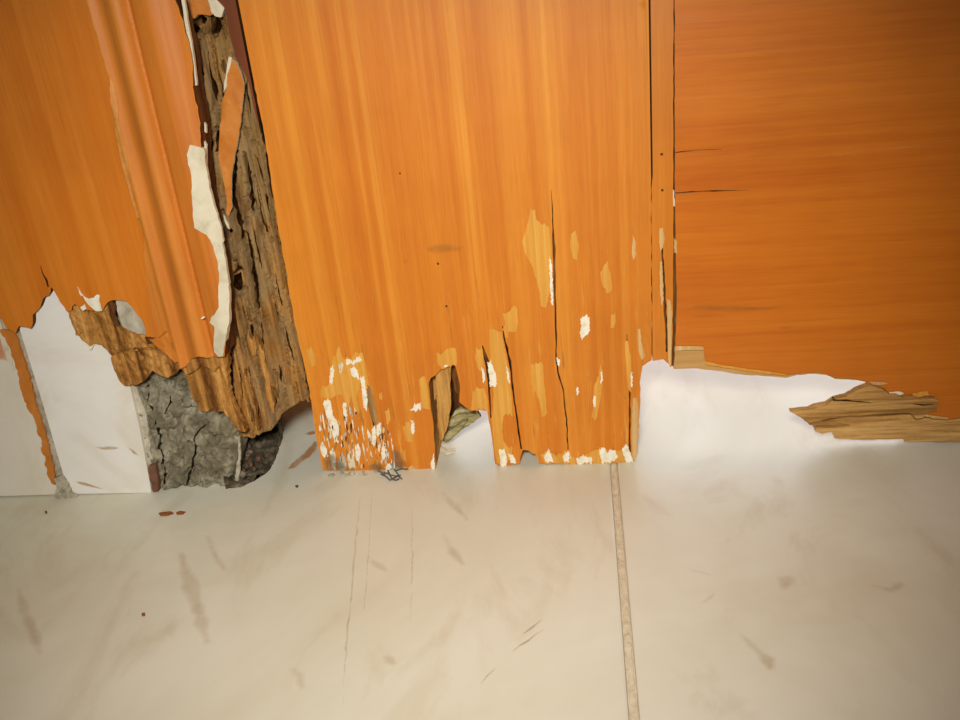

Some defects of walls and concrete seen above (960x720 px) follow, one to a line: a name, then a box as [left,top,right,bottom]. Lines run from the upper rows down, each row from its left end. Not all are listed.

peeling [181,0,198,85]
peeling [77,287,103,311]
flaking render [116,300,146,335]
peeling [187,56,245,357]
peeling [522,208,554,308]
crack [551,194,569,450]
peeling [659,227,786,376]
crack [147,385,204,484]
peeling [314,347,430,471]
peeling [471,305,518,467]
crack [482,327,521,449]
peeling [540,329,645,465]